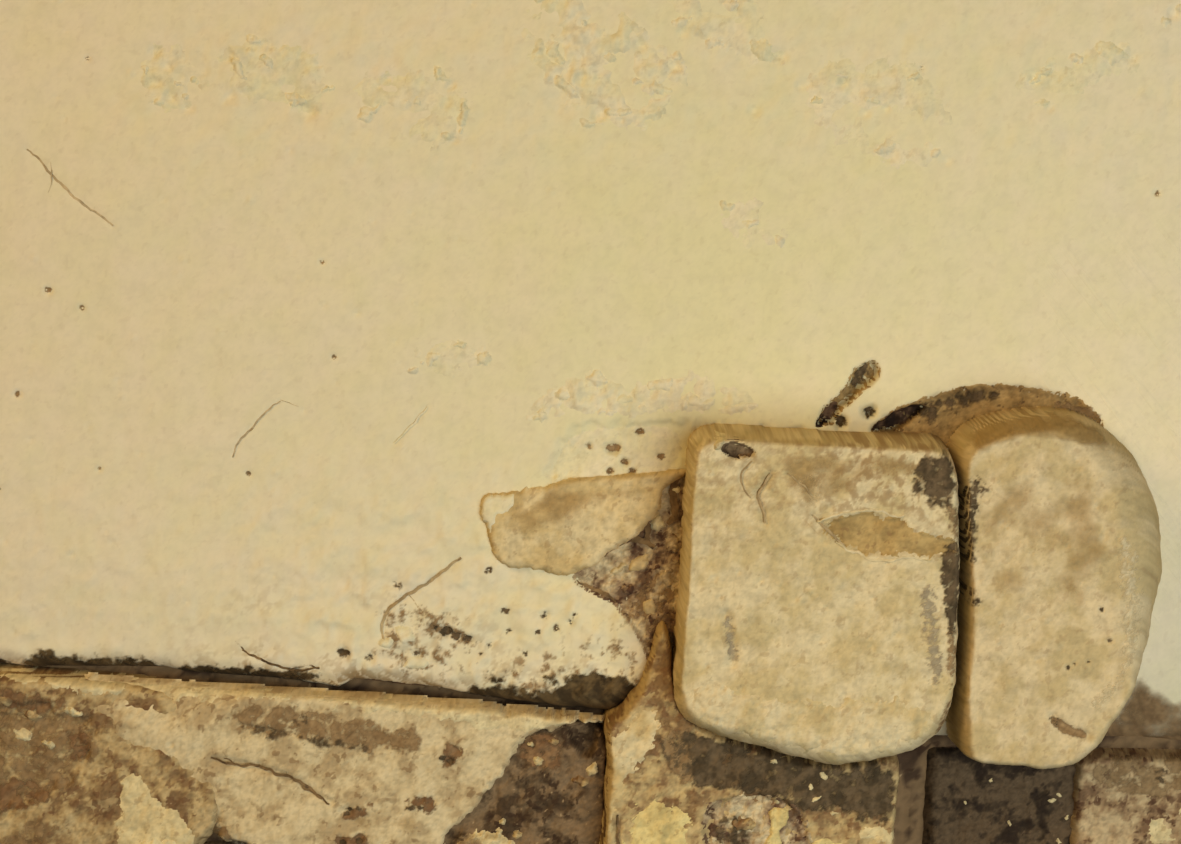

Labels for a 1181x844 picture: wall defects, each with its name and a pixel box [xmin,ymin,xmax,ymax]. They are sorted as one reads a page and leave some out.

leakage [975,408,1105,449]
peeling [480,492,514,535]
spalling [543,424,685,660]